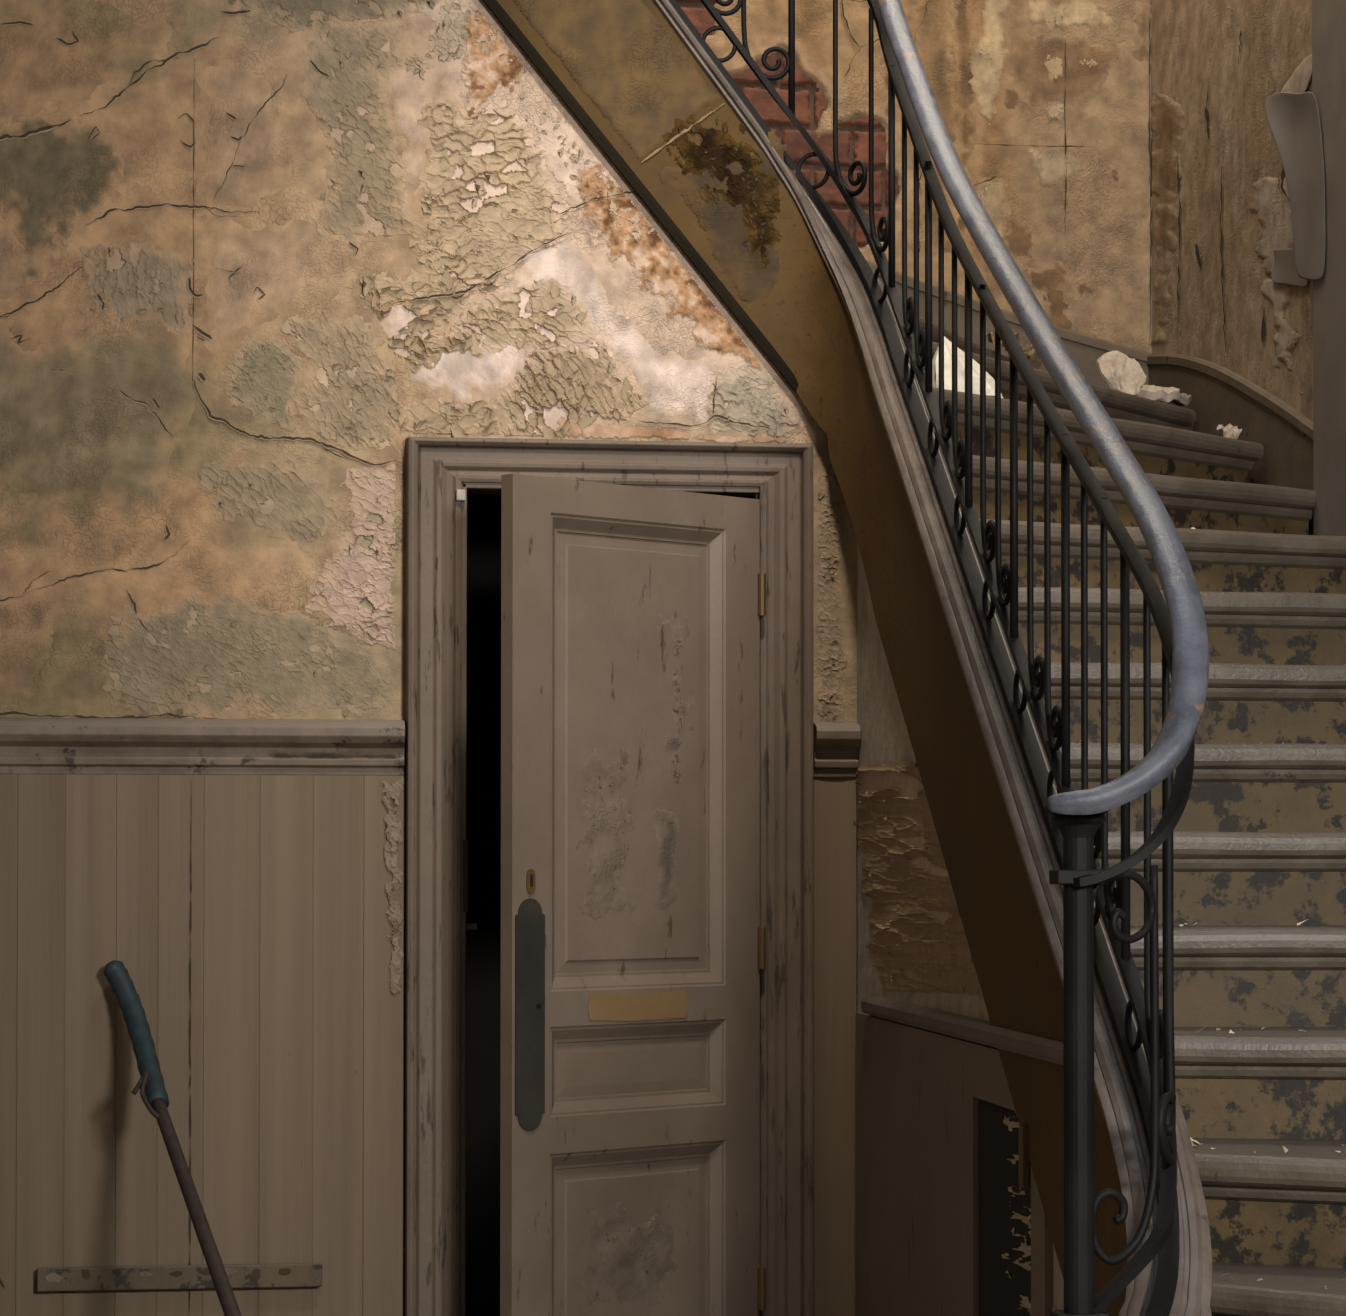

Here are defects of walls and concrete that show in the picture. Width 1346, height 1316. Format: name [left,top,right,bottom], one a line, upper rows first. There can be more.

crack [0,10,401,467]
peeling [80,0,807,720]
leakage [662,110,783,273]
flaking render [730,52,900,247]
leakage [906,0,977,184]
leakage [919,142,974,258]
leakage [1004,216,1094,328]
leakage [1004,32,1135,109]
peeling [1249,177,1303,393]
crack [0,525,189,632]
crack [0,710,205,718]
peeling [381,777,404,994]